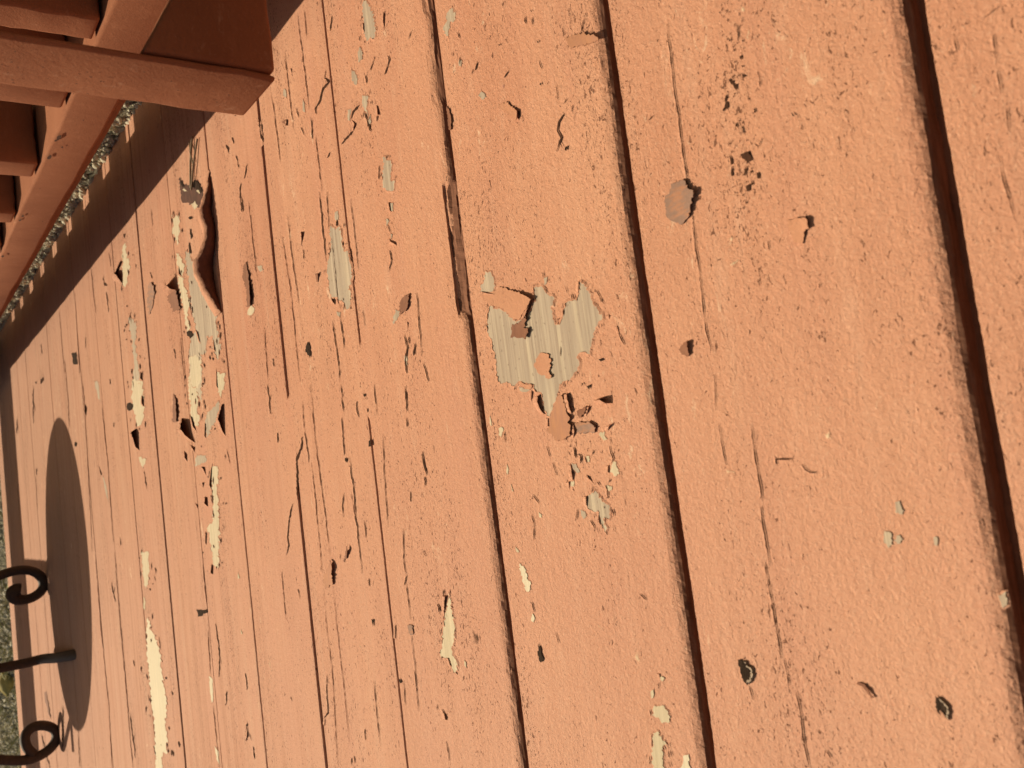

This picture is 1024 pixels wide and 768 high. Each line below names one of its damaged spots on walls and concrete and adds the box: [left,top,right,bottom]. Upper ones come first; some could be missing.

peeling [664,180,694,225]
peeling [315,210,357,317]
peeling [124,305,146,469]
peeling [162,212,226,574]
peeling [480,269,606,441]
peeling [566,455,620,535]
peeling [883,530,904,549]
peeling [139,550,180,768]
peeling [439,590,467,675]
peeling [649,673,692,768]